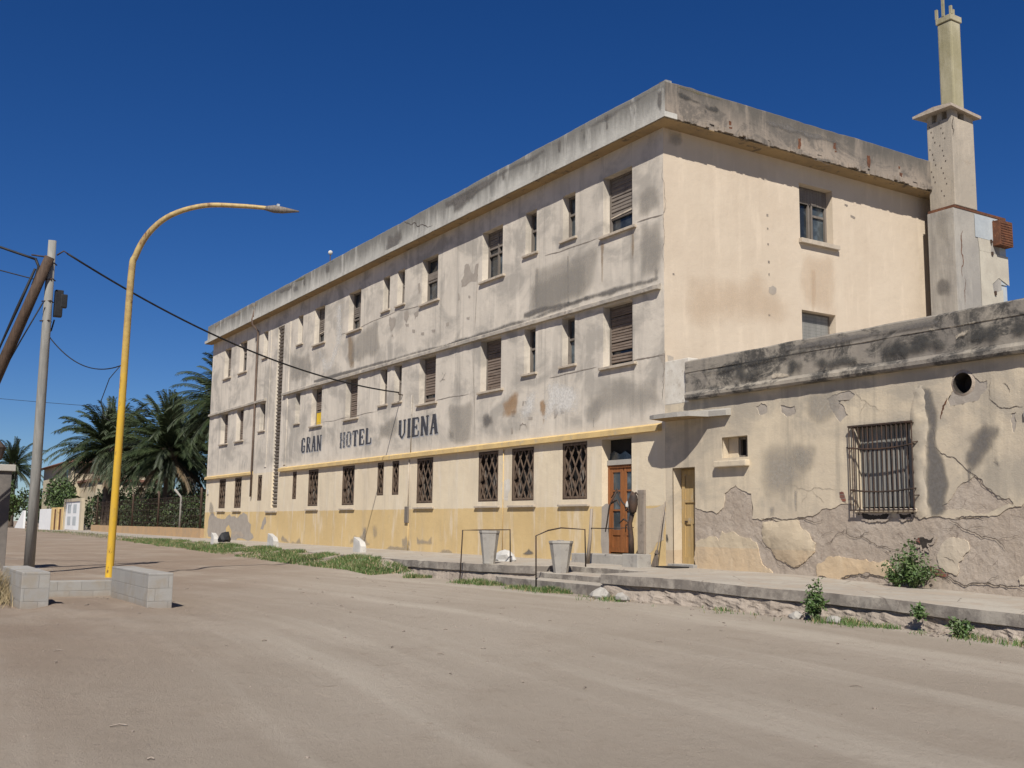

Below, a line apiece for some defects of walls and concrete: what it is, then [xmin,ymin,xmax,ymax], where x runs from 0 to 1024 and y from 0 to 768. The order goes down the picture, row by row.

leakage [446,156,536,211]
leakage [708,320,944,387]
leakage [971,328,998,341]
leakage [923,389,948,515]
crack [934,400,1013,505]
leakage [967,429,997,479]
peeling [207,512,266,541]
spalling [695,476,1024,598]